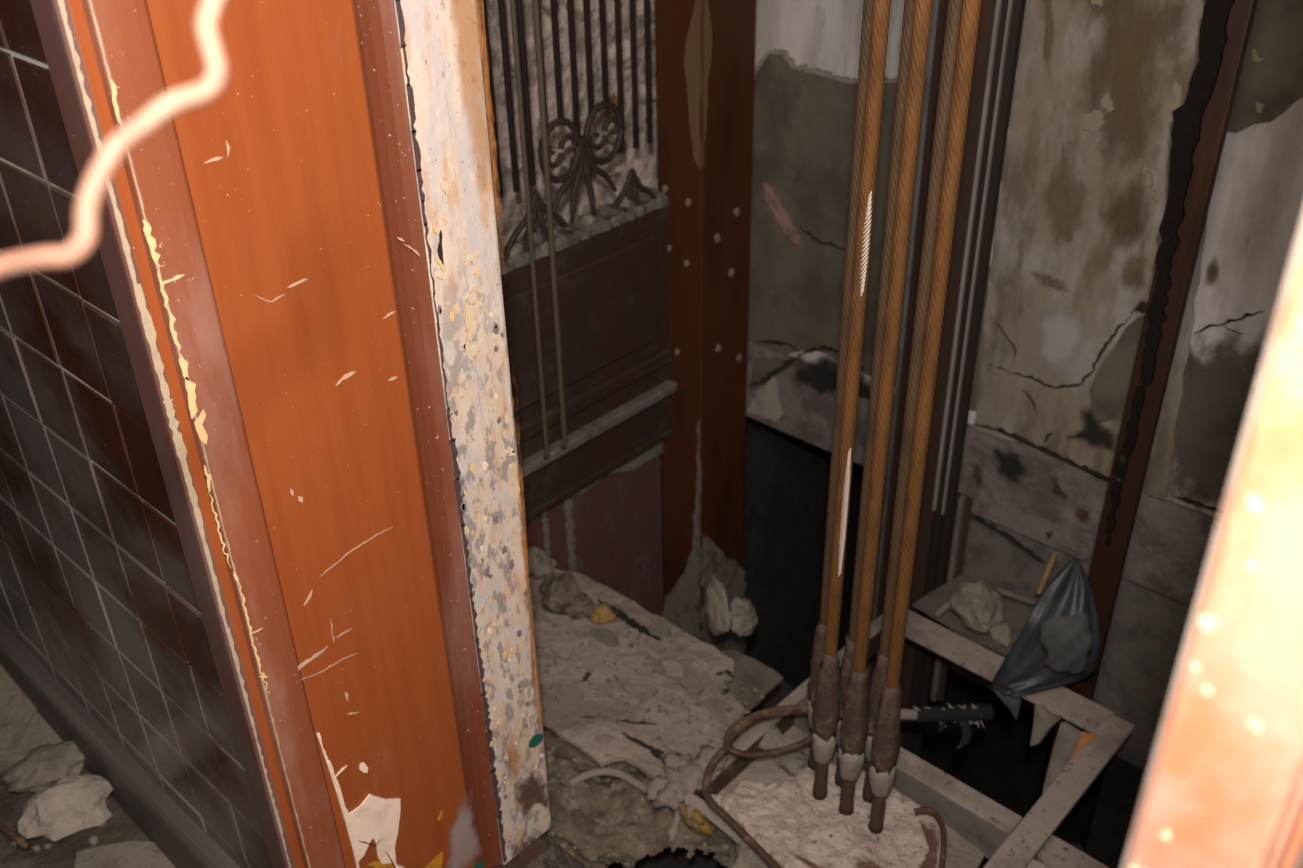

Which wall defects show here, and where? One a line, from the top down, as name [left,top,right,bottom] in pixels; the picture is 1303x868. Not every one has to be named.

peeling [58,0,102,149]
spalling [89,0,122,126]
rust [453,0,496,175]
water stain [1091,0,1183,156]
water stain [1112,187,1142,241]
water stain [1123,258,1145,286]
water stain [1135,301,1147,313]
peeling [108,153,311,868]
peeling [395,0,544,863]
crack [972,310,1137,480]
crack [1174,496,1221,513]
peeling [317,732,404,868]